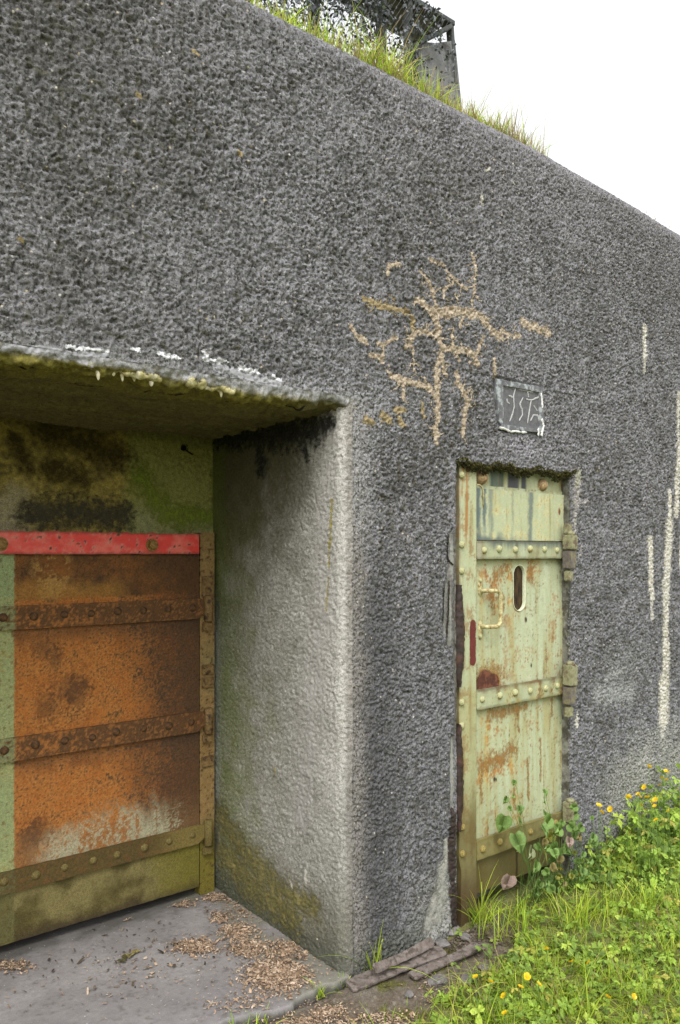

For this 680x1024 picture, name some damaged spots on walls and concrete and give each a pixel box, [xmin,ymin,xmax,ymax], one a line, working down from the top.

damp [9,422,132,493]
damp [212,412,337,478]
corrosion [476,665,504,689]
corrosion [487,703,527,732]